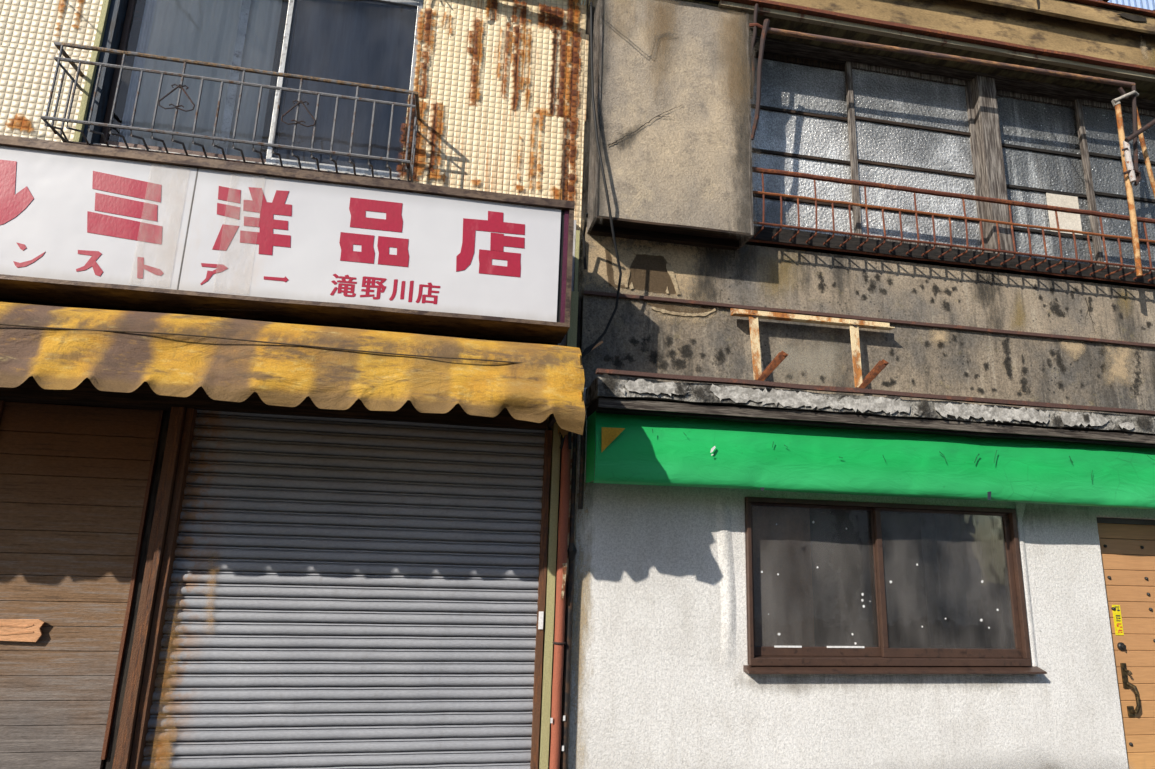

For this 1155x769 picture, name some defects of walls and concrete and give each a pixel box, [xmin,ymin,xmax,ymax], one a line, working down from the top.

rust [397,8,453,182]
rust [467,0,581,201]
crack [608,105,681,146]
spalling [605,249,716,323]
mould [848,270,892,300]
mould [913,279,960,311]
leakage [975,273,999,321]
mould [1034,284,1093,317]
leakage [964,361,997,394]
leakage [1002,337,1030,396]
leakage [1042,350,1069,398]
peeling [710,384,1135,430]